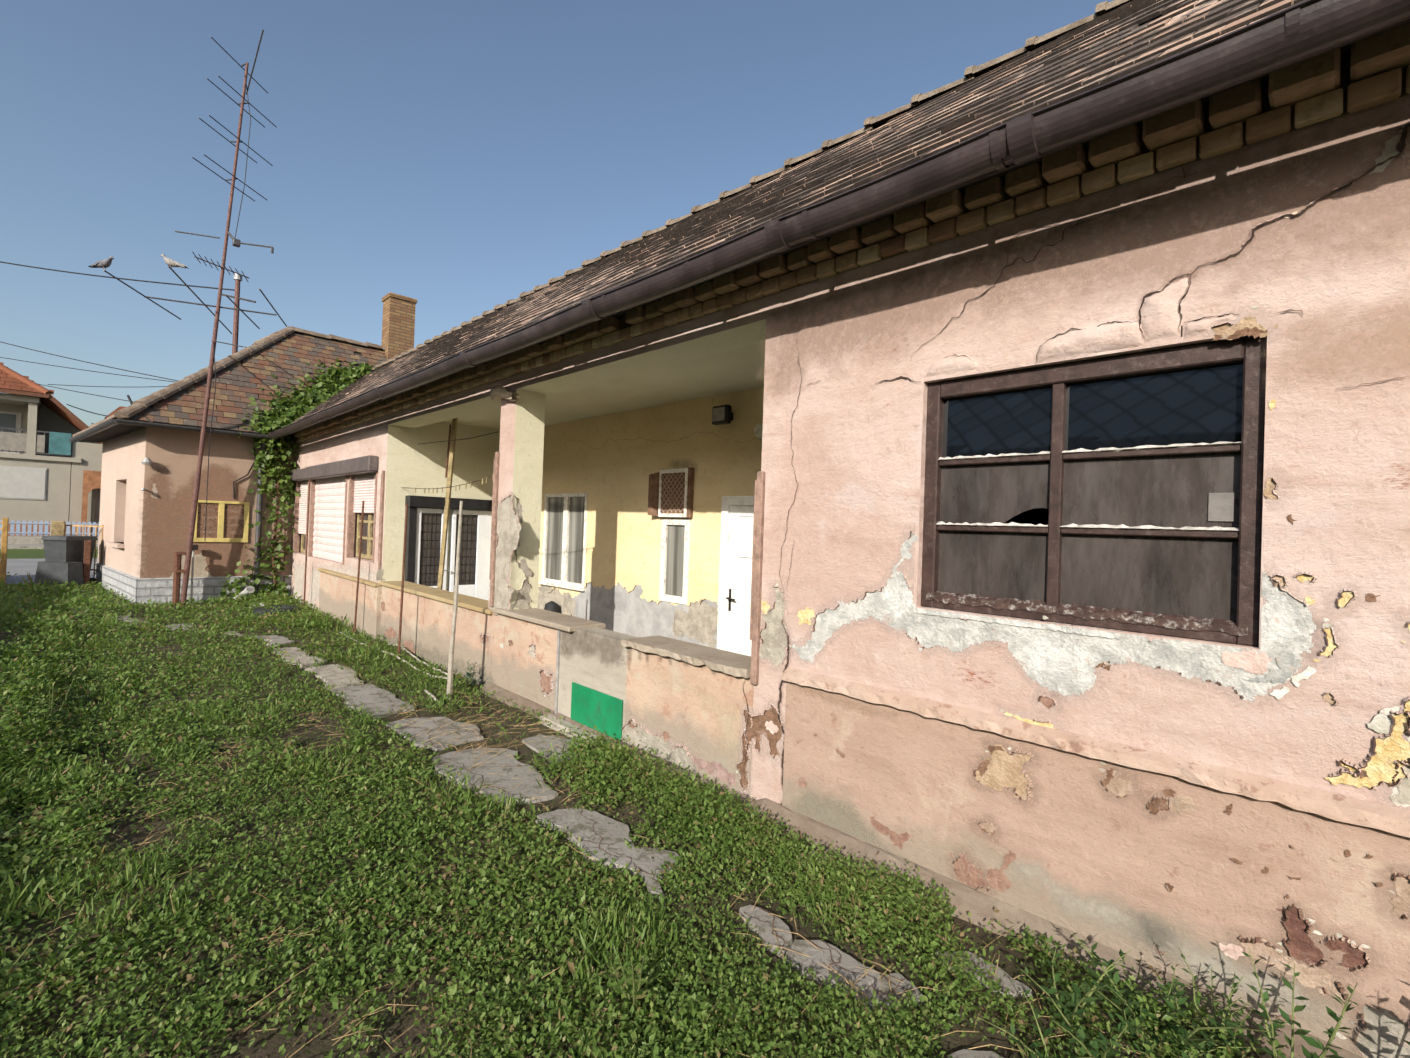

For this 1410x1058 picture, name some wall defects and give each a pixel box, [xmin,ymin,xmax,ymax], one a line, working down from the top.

crack [875,164,1207,384]
crack [1036,121,1410,361]
crack [1336,376,1409,390]
flaking render [489,495,533,616]
crack [743,299,822,805]
peeling [480,633,554,696]
flaking render [759,530,1380,730]
flaking render [620,704,818,796]
flaking render [973,744,1034,802]
peeling [1324,696,1410,807]
flaking render [1375,867,1410,920]
flaking render [1219,876,1410,1058]